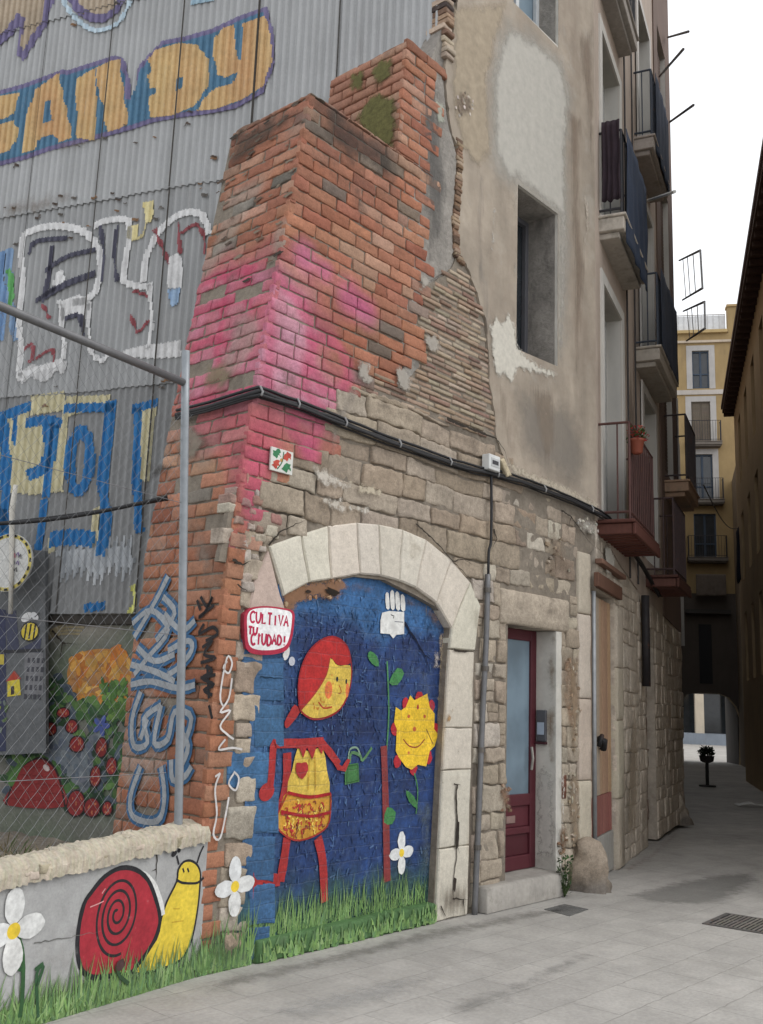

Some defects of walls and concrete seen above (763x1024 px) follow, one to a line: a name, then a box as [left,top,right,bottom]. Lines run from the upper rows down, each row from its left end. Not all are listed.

flaking render [359,137,497,437]
crack [453,783,461,821]
crack [441,849,467,919]